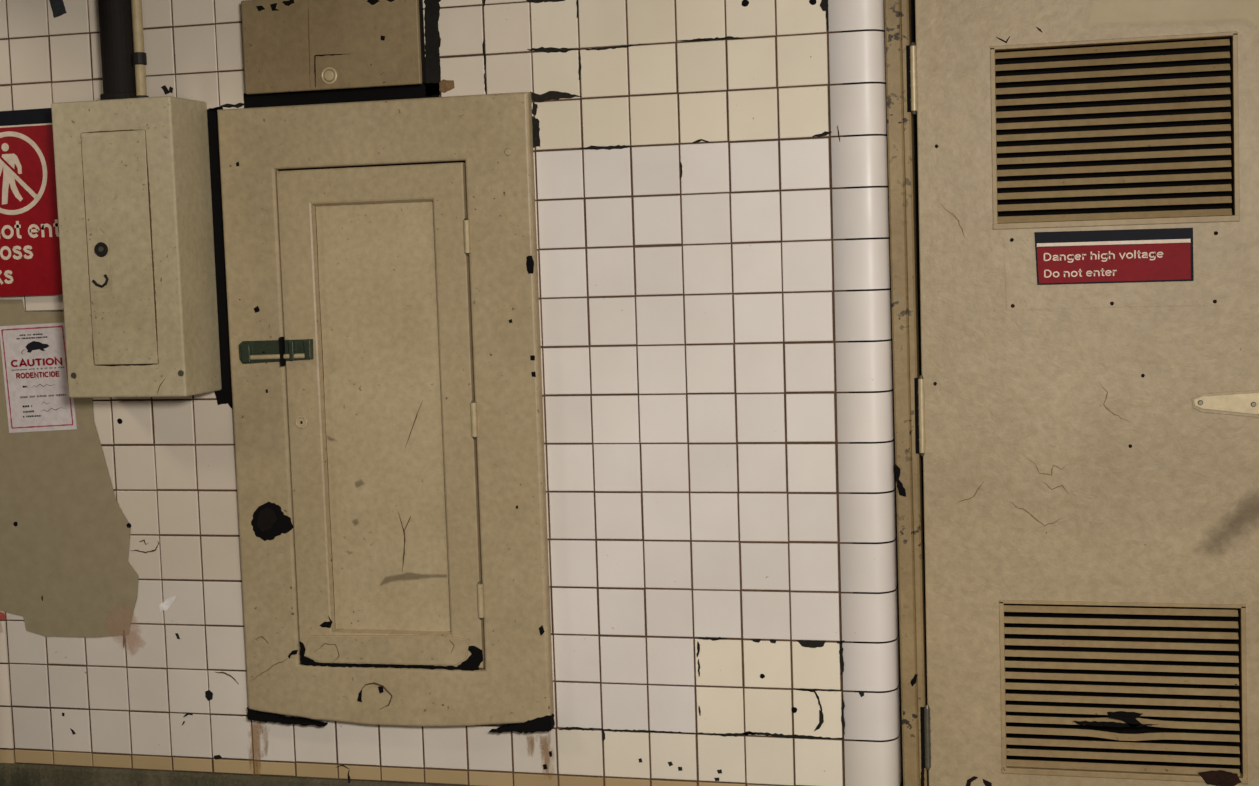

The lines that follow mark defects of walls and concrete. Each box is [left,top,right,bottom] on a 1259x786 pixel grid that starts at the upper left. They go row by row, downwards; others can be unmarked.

spalling [820,0,829,30]
spalling [530,91,582,148]
spalling [797,640,826,648]